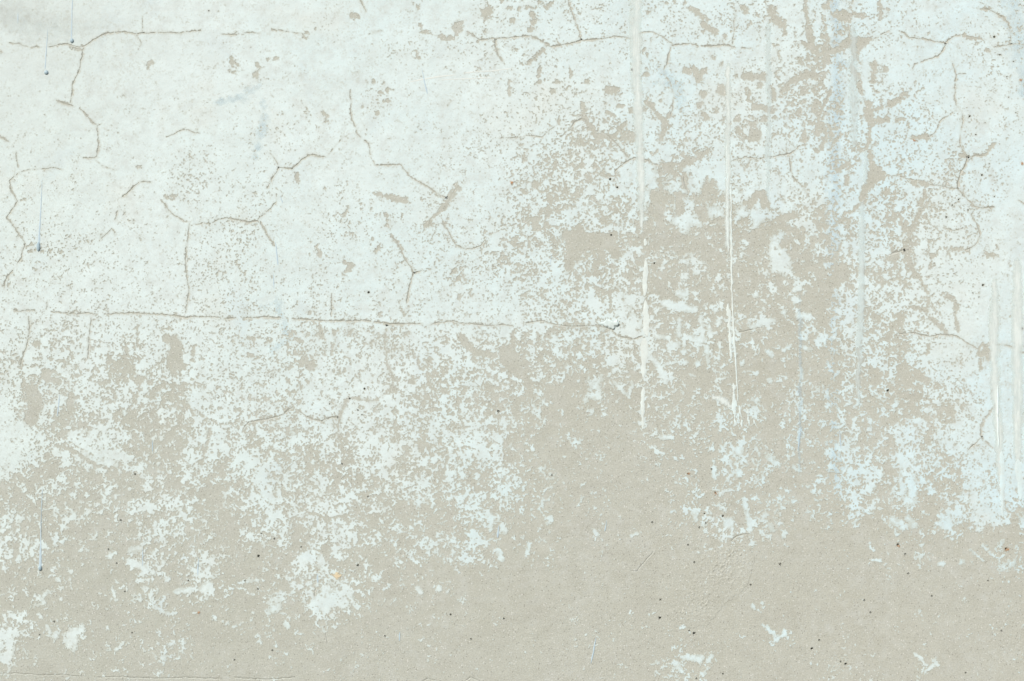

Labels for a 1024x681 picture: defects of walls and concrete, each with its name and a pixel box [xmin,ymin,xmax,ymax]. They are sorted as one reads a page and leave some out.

crack [9,18,303,168]
crack [0,90,658,457]
peeling [372,192,409,204]
crack [467,0,757,115]
leakage [640,260,650,429]
crack [681,176,689,193]
leakage [712,64,757,428]
peeling [515,34,976,535]
crack [733,145,809,197]
crack [874,31,994,291]
peeling [0,318,1024,681]